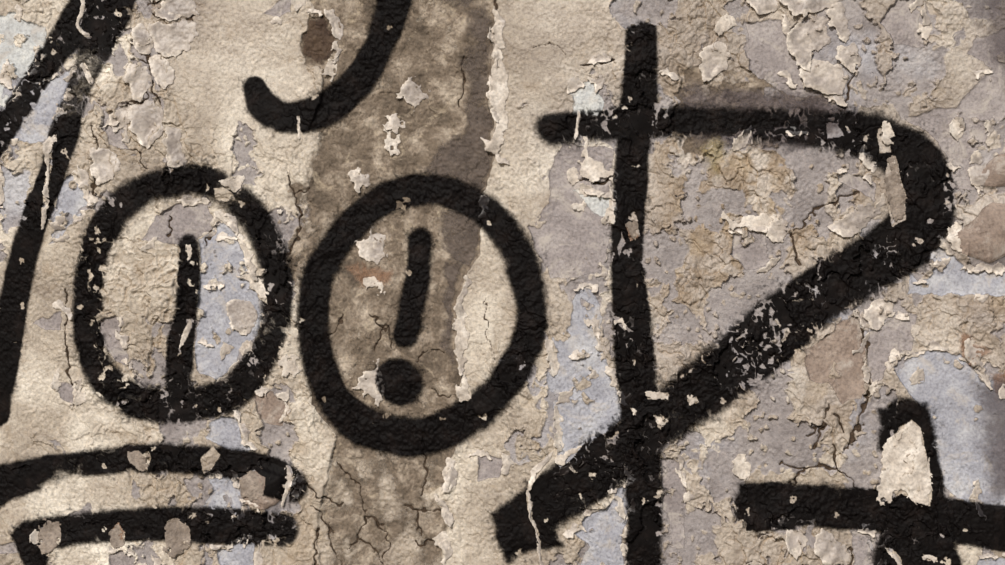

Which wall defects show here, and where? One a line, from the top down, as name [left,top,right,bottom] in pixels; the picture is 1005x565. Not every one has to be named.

peeling [0,0,200,244]
peeling [140,194,272,387]
peeling [202,468,264,523]
crack [307,462,391,565]
spalling [252,354,458,565]
spalling [265,0,509,420]
crack [404,455,441,547]
peeling [526,75,639,565]
peeling [659,0,862,108]
spalling [785,523,901,565]
peeling [804,298,1005,520]
peeling [908,218,1005,303]